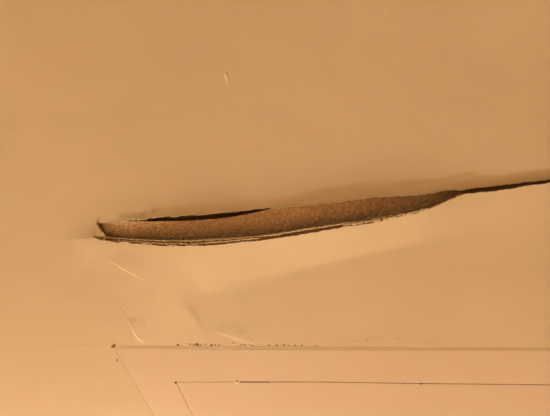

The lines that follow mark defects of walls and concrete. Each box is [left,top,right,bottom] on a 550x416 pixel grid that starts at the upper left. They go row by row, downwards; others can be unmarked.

crack [461,180,550,195]